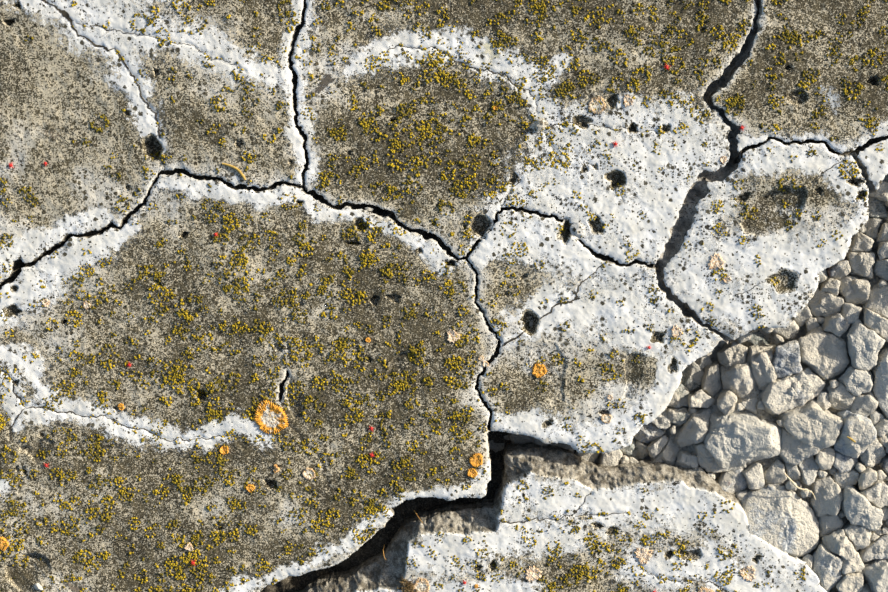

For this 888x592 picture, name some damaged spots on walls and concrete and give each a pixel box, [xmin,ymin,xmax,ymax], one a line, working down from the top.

spalling [288,4,308,156]
crack [386,45,657,161]
spalling [694,0,850,211]
spalling [197,174,400,234]
crack [540,0,888,344]
spalling [735,185,825,237]
crack [0,0,570,592]
spalling [474,289,502,345]
spalling [766,269,800,294]
spalling [817,256,851,296]
spalling [295,433,765,592]
crack [499,491,627,524]